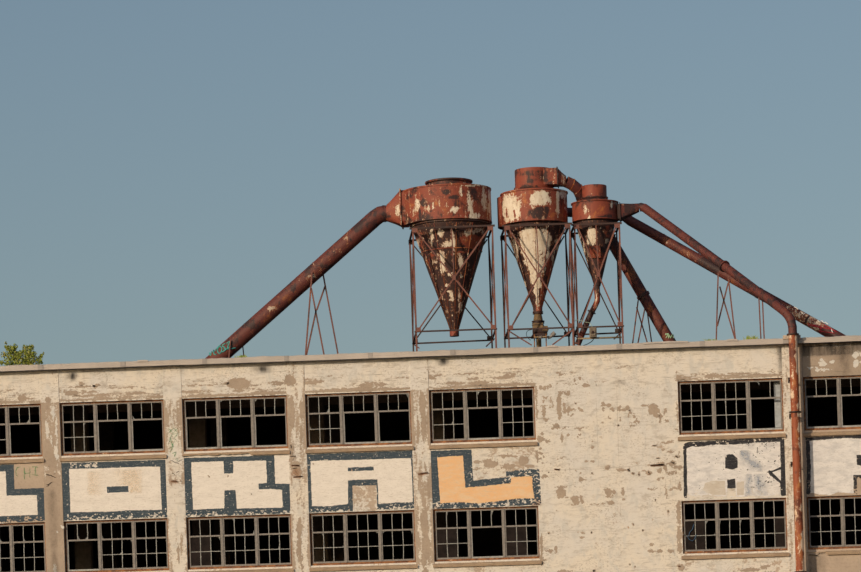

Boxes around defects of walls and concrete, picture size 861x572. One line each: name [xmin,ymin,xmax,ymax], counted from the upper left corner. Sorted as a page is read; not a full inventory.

peeling [807,358,835,372]
peeling [62,382,147,400]
peeling [416,371,590,479]
peeling [554,485,625,506]
peeling [584,401,685,571]